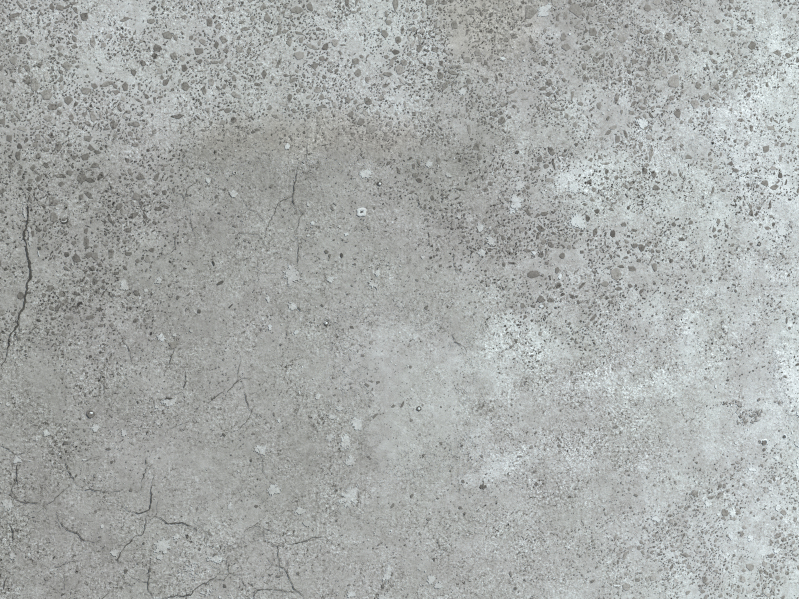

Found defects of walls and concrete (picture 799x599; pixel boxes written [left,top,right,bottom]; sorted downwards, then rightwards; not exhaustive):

crack [1,173,32,366]
crack [0,444,340,599]